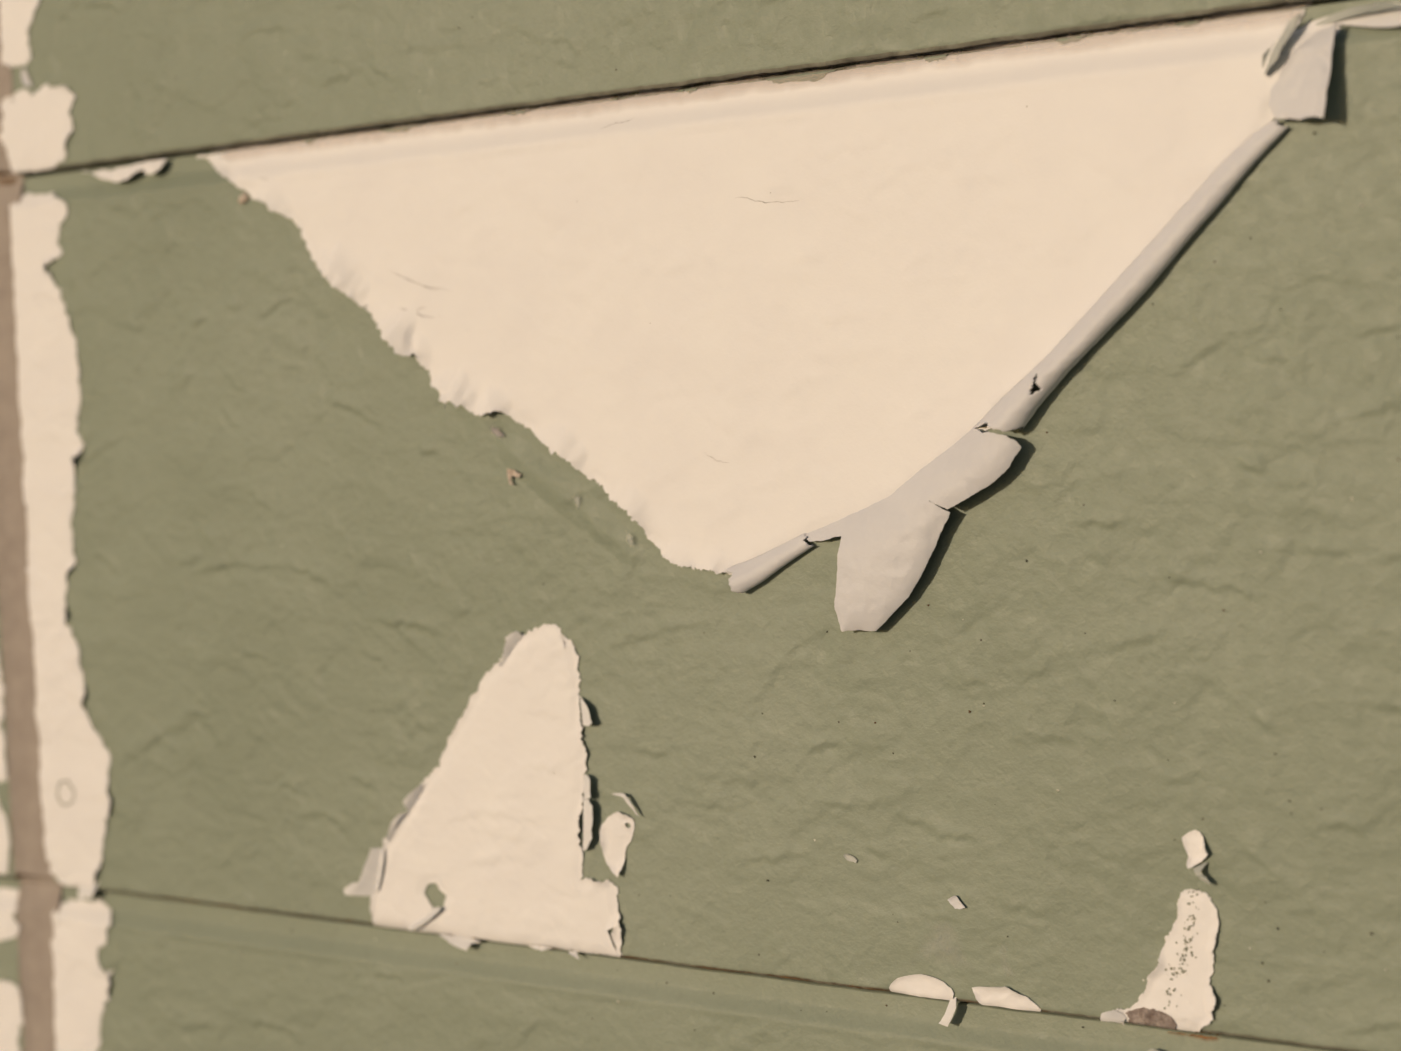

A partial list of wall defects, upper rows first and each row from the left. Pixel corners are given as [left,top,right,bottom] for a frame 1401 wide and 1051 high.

peeling [0,0,76,174]
peeling [196,1,1401,632]
peeling [10,192,114,1051]
peeling [0,669,8,783]
peeling [0,806,20,941]
peeling [0,979,24,1051]
peeling [344,624,639,959]
peeling [889,974,957,1027]
peeling [972,986,1041,1012]
peeling [1100,830,1219,1032]